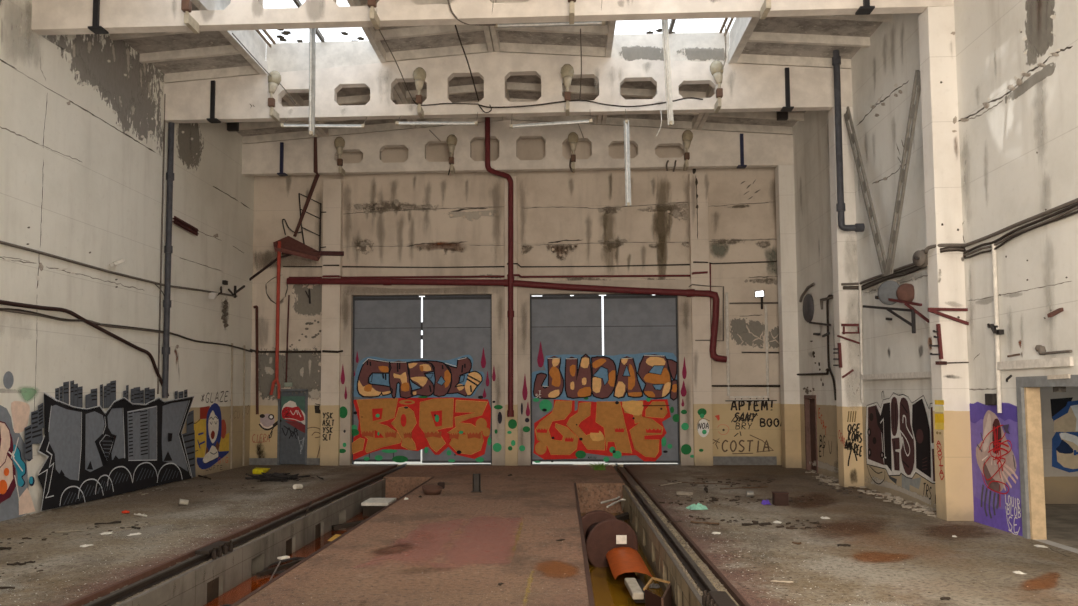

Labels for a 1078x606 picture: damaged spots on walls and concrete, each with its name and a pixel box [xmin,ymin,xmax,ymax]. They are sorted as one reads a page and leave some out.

peeling [1019,0,1056,65]
peeling [42,34,165,150]
crack [958,46,1072,122]
crack [0,57,154,291]
peeling [176,123,204,170]
peeling [729,315,779,349]